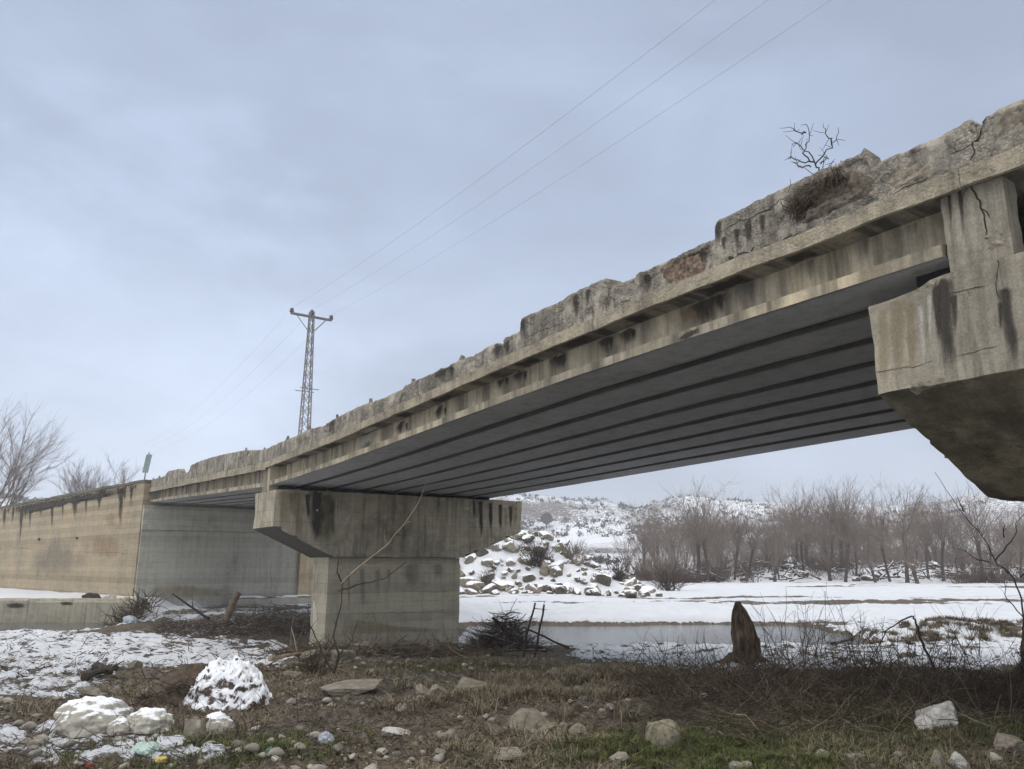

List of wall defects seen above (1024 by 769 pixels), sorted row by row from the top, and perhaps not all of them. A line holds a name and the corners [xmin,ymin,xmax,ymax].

crack [950,128,982,159]
crack [962,187,990,235]
damp [919,279,957,354]
damp [998,289,1017,353]
damp [1,485,136,535]
damp [305,491,350,537]
damp [473,500,512,532]